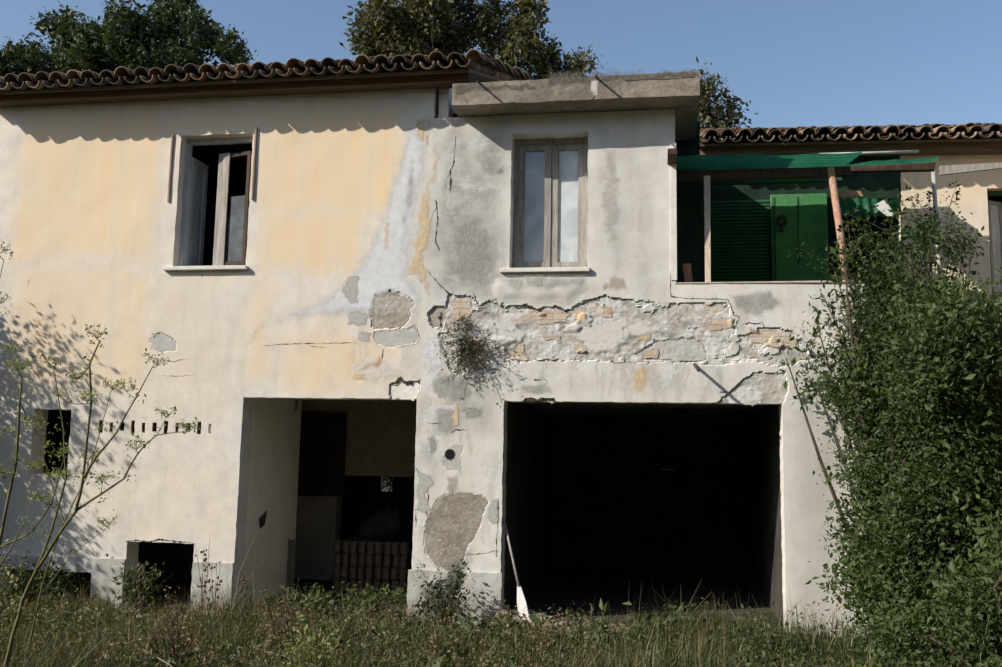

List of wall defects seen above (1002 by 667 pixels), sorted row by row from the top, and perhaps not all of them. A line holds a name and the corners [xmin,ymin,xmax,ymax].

leakage [298,120,430,315]
flaking render [151,333,176,352]
flaking render [343,276,418,346]
flaking render [428,295,809,406]
flaking render [390,380,420,401]
flaking render [425,492,499,571]